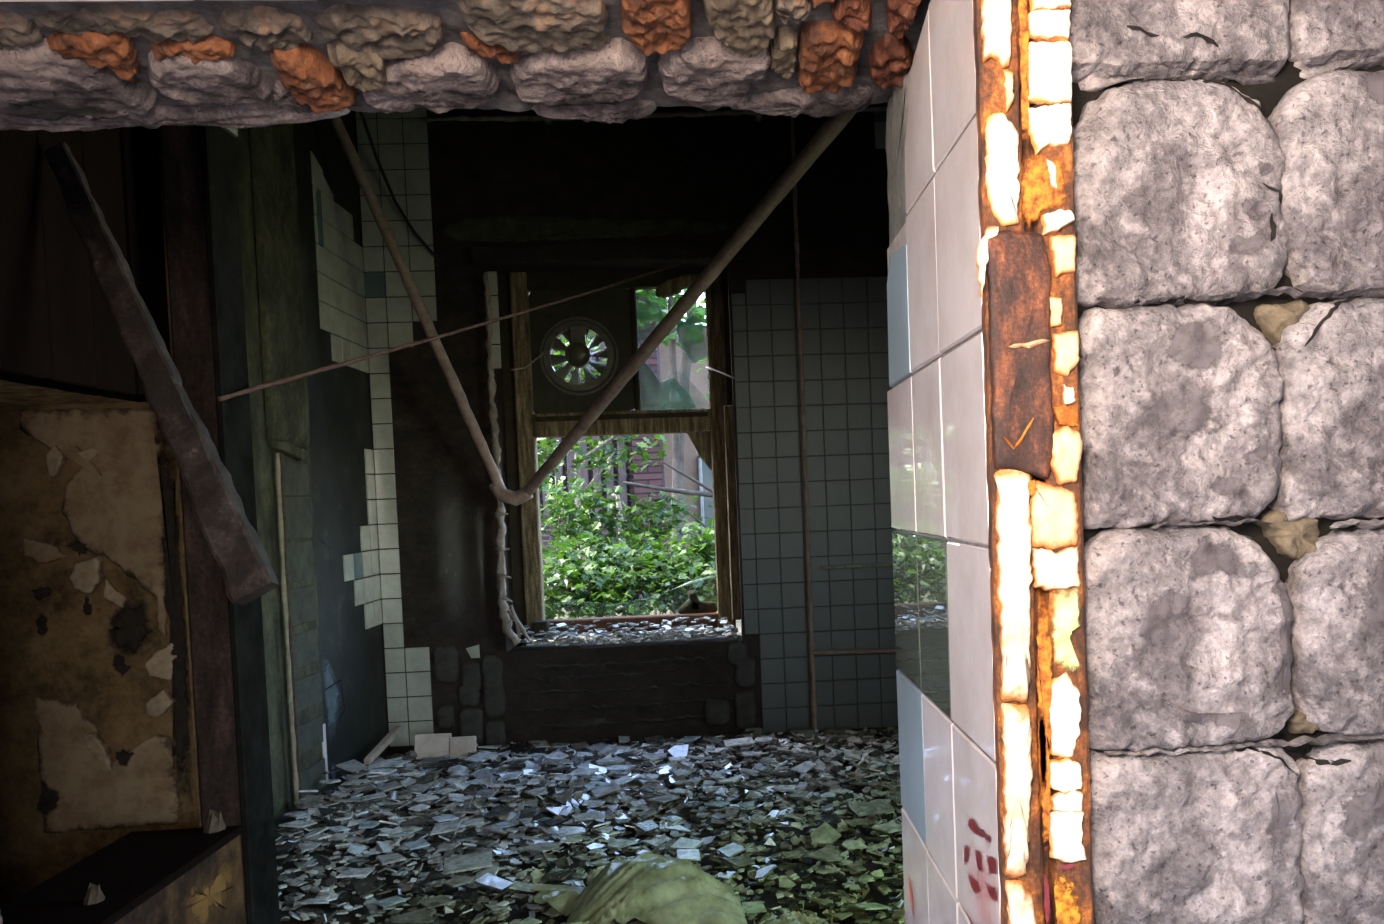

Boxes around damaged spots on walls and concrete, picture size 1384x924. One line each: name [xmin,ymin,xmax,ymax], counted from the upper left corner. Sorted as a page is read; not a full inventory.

rust [1018,0,1030,128]
rust [1021,155,1066,222]
spalling [0,0,931,461]
rust [1028,480,1036,496]
damp [109,601,152,676]
damp [155,423,191,794]
damp [116,749,134,766]
rust [1036,607,1052,839]
damp [37,781,59,815]
rust [1054,877,1081,924]